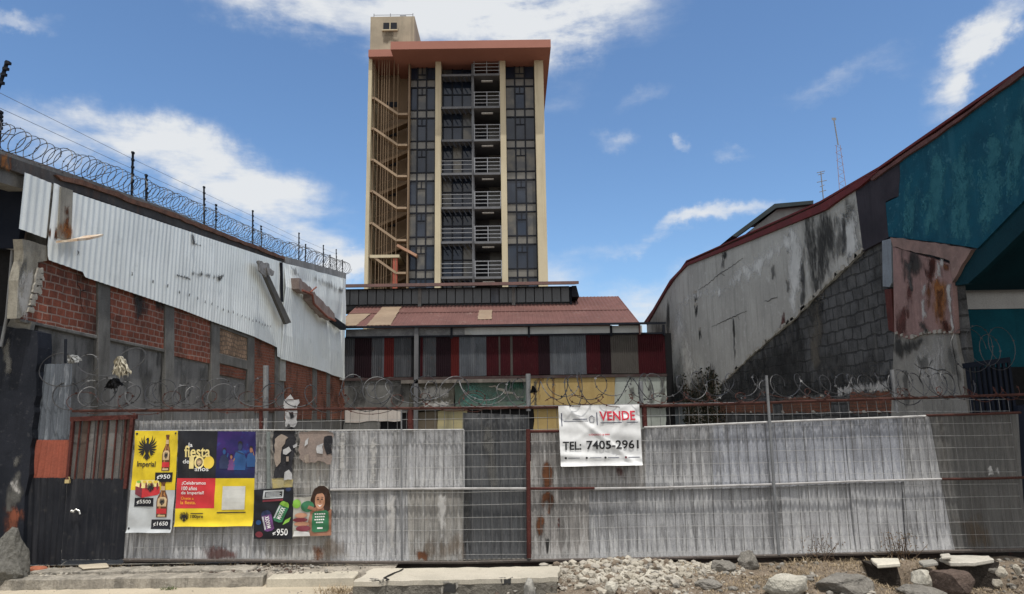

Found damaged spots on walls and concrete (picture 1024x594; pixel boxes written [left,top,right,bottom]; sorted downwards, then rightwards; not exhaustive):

corrosion [49,207,72,240]
spalling [18,260,45,316]
leakage [648,201,887,414]
corrosion [925,258,951,332]
corrosion [537,461,560,535]